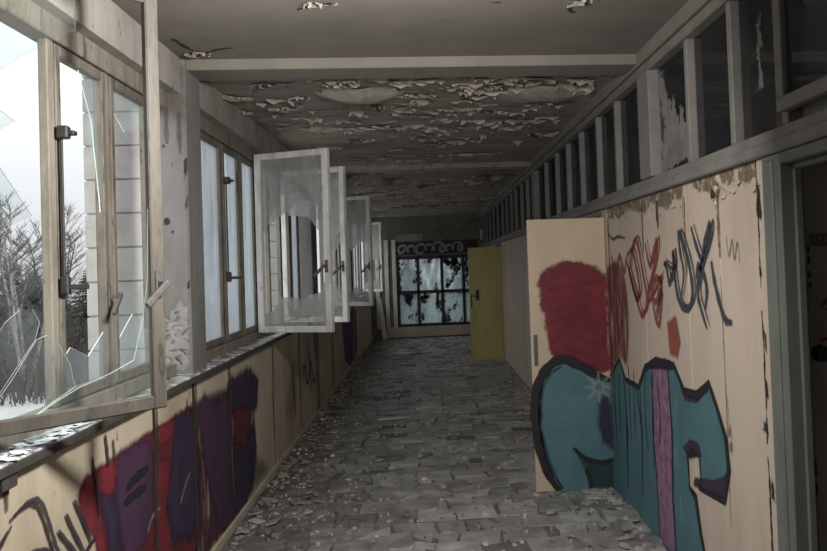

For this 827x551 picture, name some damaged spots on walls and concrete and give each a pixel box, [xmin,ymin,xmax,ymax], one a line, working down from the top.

peeling [222,76,597,209]
peeling [165,299,191,372]